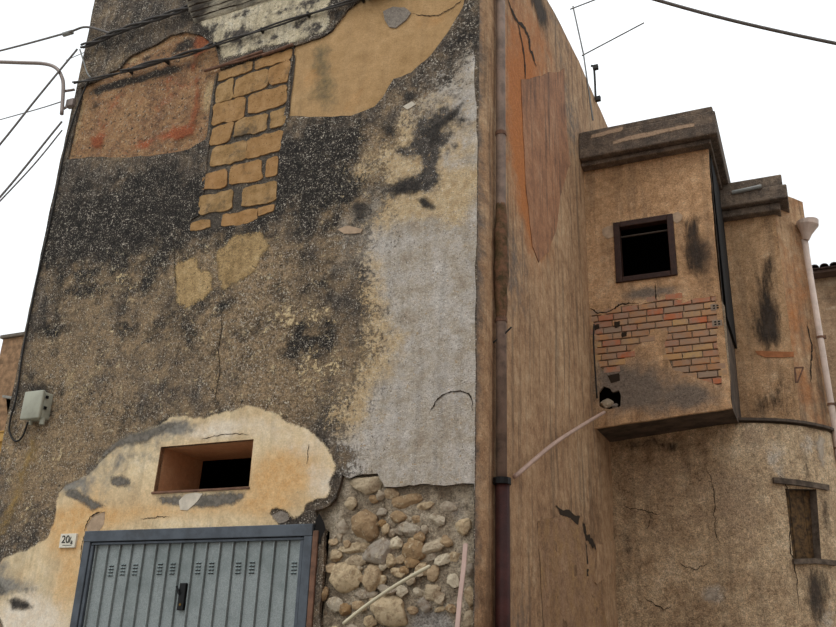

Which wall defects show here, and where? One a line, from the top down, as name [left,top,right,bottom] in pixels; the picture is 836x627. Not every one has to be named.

leakage [394,180,434,209]
leakage [685,219,704,274]
leakage [752,259,780,348]
crack [214,308,222,400]
flaking render [589,293,731,387]
crack [431,390,473,411]
leakage [809,572,828,621]